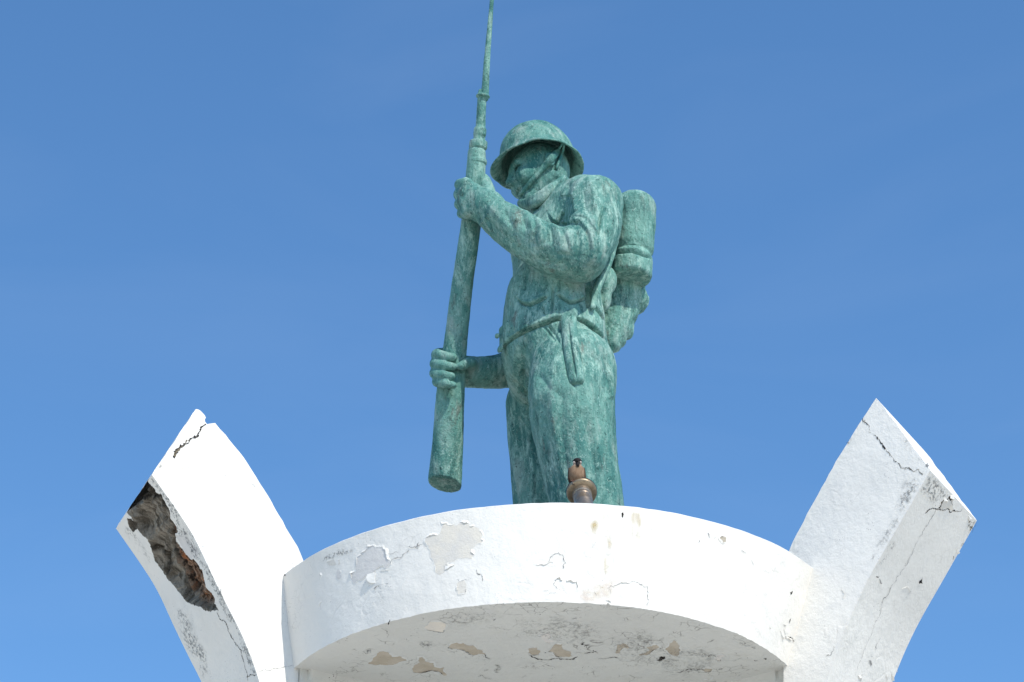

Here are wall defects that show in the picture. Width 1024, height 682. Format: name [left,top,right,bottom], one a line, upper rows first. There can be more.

crack [173,424,206,458]
crack [862,419,923,475]
spalling [127,485,219,612]
peeling [319,544,392,589]
peeling [423,520,485,576]
peeling [368,651,448,676]
peeling [423,620,486,656]
peeling [527,643,588,658]
peeling [615,640,682,664]